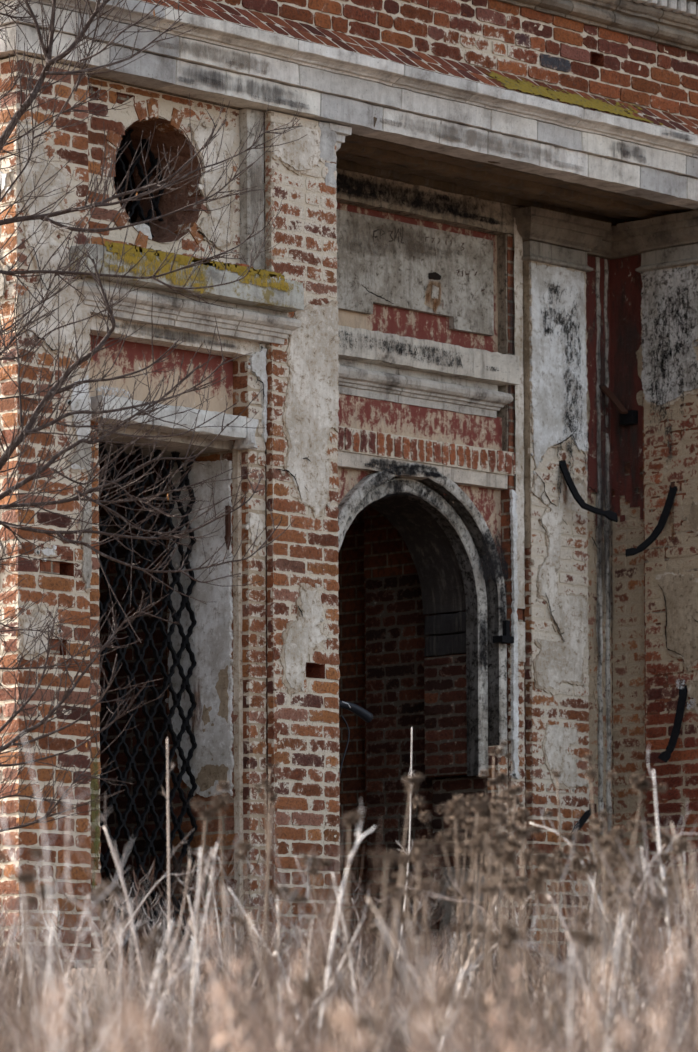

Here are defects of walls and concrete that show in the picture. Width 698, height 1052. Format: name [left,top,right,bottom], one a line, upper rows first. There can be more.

flaking render [188,121,236,250]
flaking render [271,122,323,176]
flaking render [281,300,340,519]
crack [536,473,567,533]
flaking render [528,260,590,695]
damp [540,283,698,659]
flaking render [280,583,331,694]
flaking render [509,490,520,780]
flaking render [656,569,698,715]
flaking render [542,723,590,792]